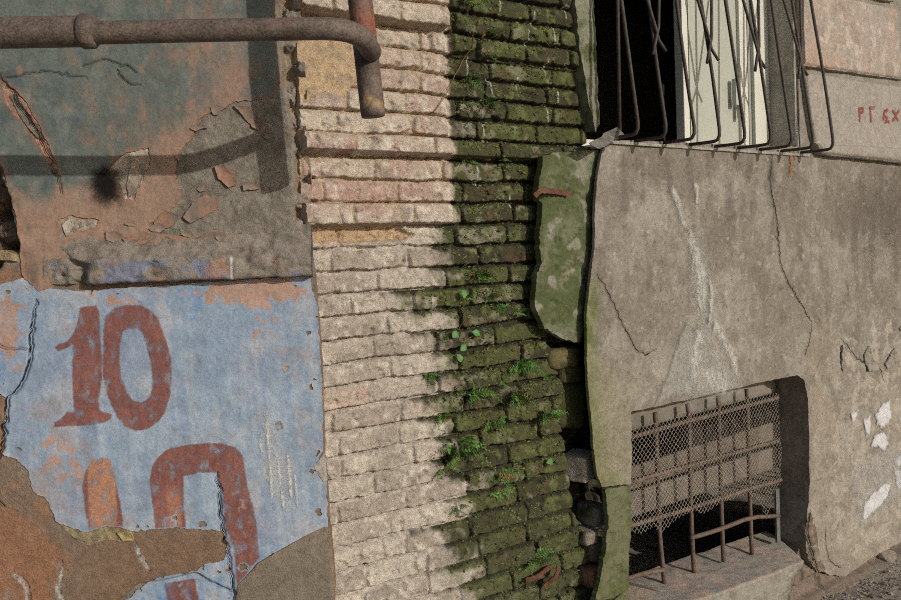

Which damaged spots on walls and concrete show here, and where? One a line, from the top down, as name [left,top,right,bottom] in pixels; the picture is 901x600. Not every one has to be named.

peeling [2,79,58,172]
crack [0,59,138,191]
spalling [58,98,296,246]
crack [0,300,37,454]
crack [597,274,650,355]
efflorescence [691,330,726,391]
efflorescence [689,233,737,371]
crack [770,155,812,355]
spalling [60,524,135,545]